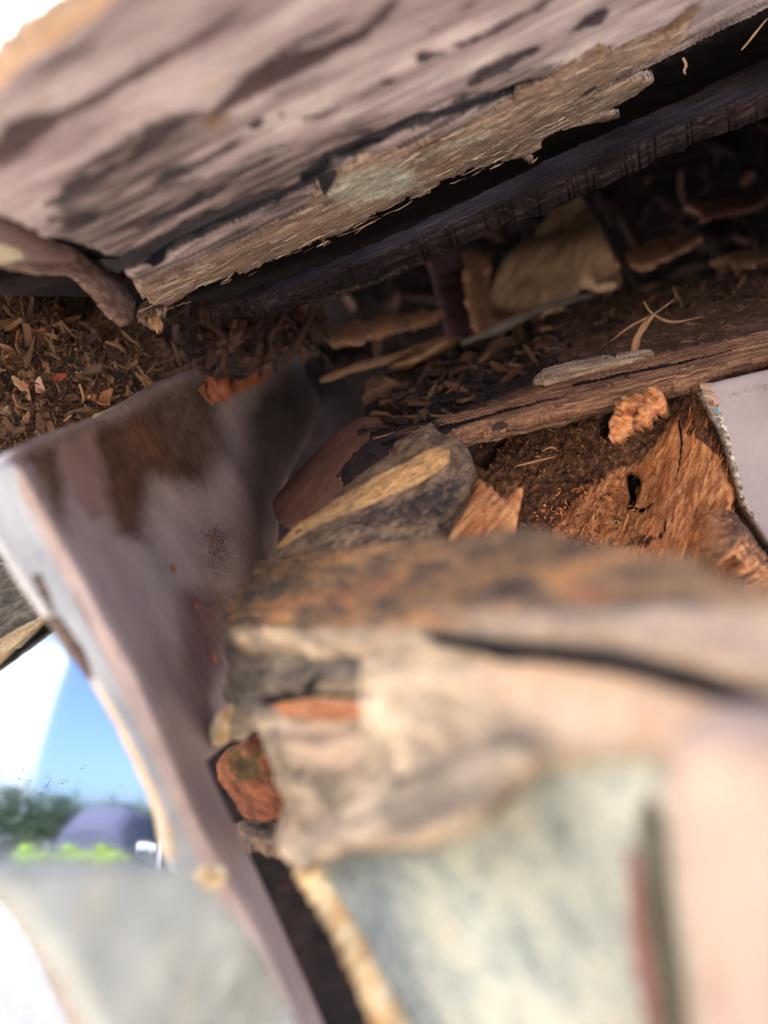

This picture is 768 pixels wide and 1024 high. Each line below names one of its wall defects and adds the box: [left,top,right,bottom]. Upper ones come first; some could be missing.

spalling [700,383,719,418]
crack [629,473,667,539]